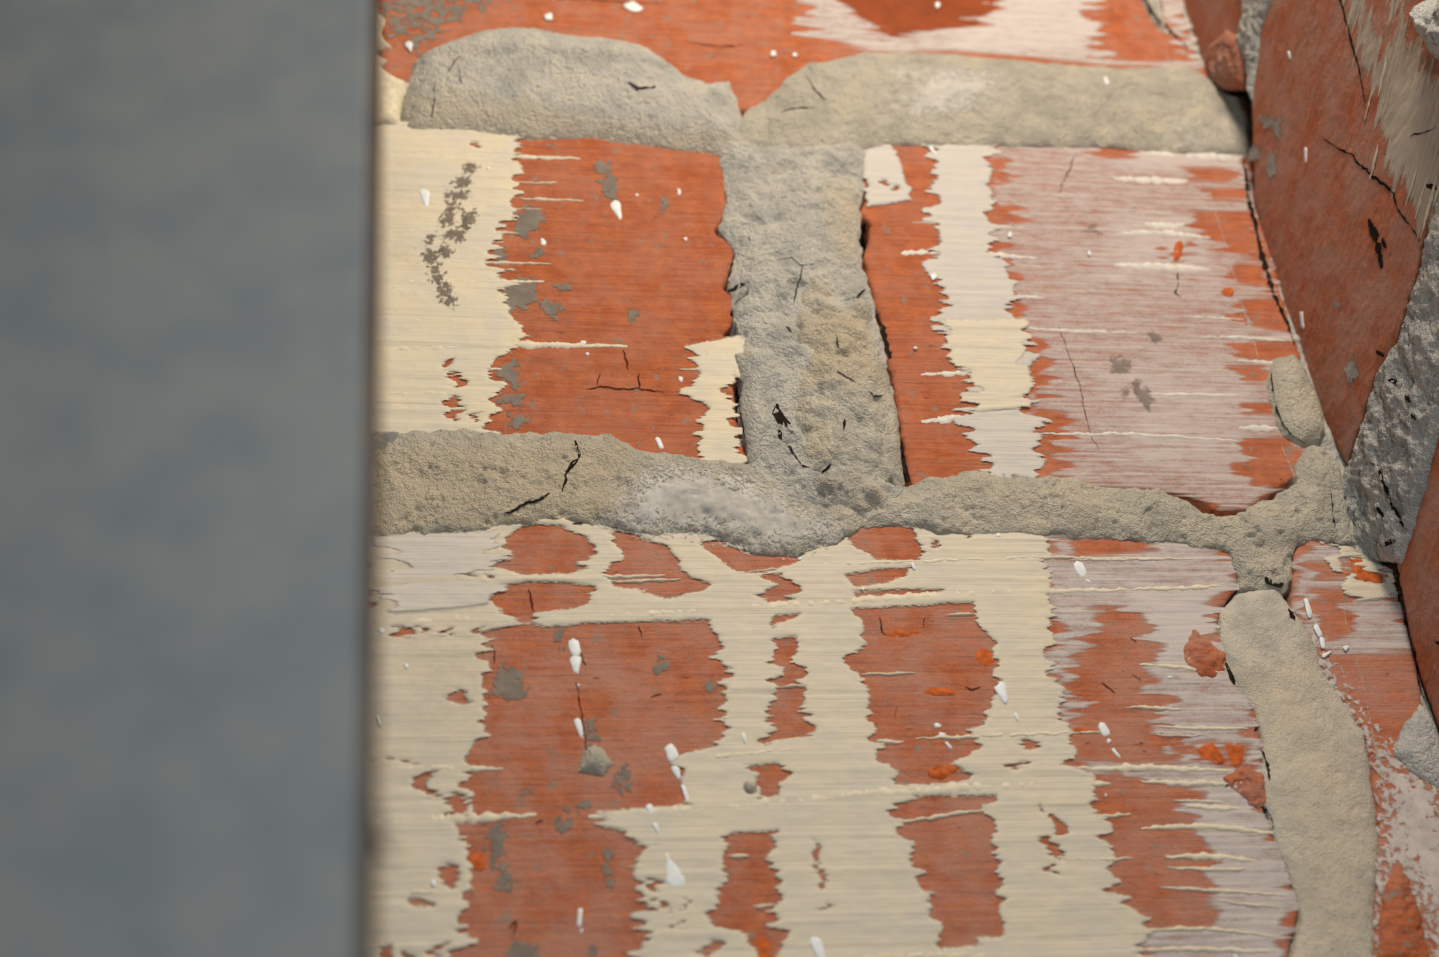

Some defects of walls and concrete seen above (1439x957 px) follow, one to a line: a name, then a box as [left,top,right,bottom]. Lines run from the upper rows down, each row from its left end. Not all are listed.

peeling [838,0,1001,38]
crack [1339,0,1365,101]
spalling [1173,241,1183,261]
crack [504,440,583,524]
spalling [1350,556,1383,584]
spalling [975,648,996,667]
spalling [1184,630,1226,678]
spalling [928,764,957,780]
spalling [1196,742,1267,811]
spalling [468,853,486,872]
spalling [1377,861,1430,957]
spalling [754,937,774,957]